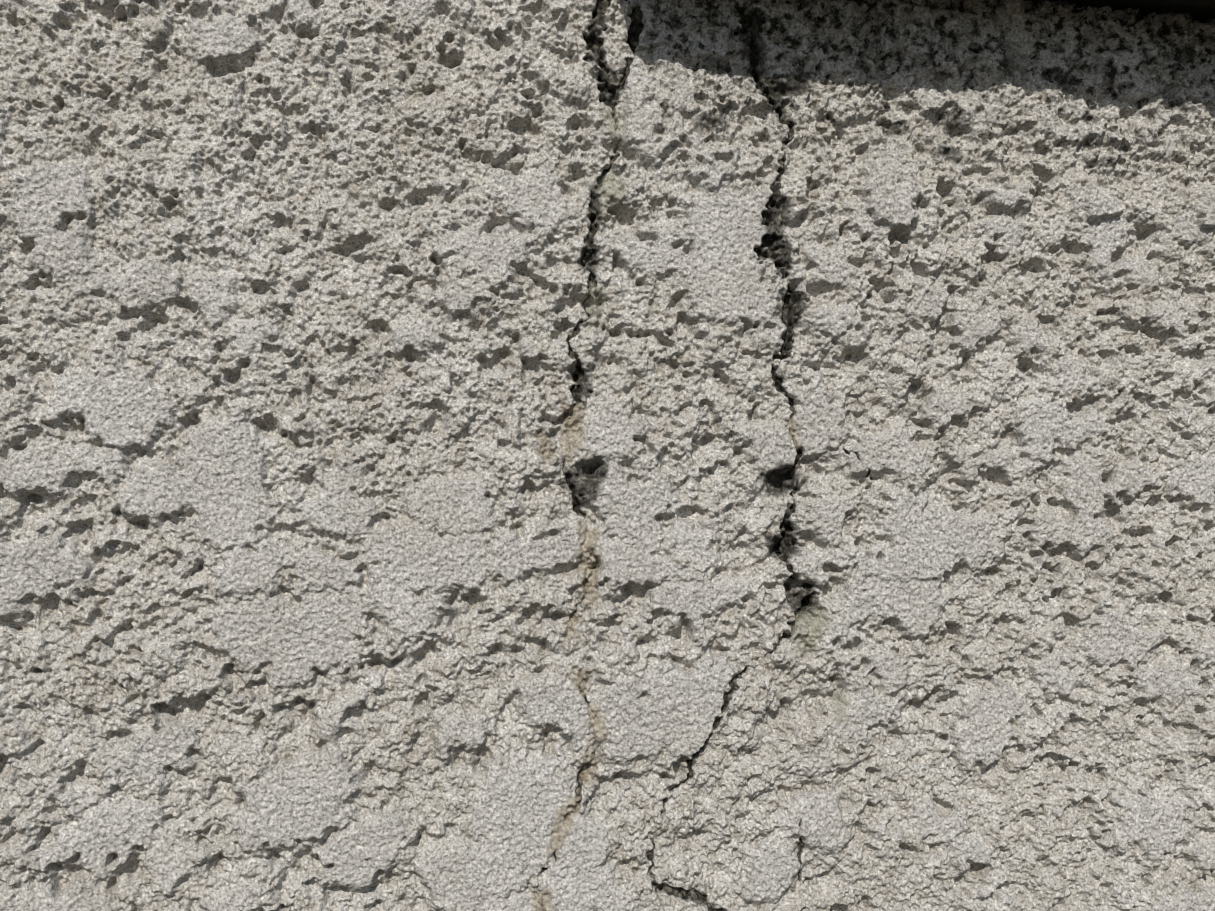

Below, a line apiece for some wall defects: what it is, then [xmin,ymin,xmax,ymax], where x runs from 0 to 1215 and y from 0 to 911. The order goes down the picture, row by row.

crack [566,0,644,416]
crack [561,460,586,518]
crack [646,6,808,911]
crack [570,555,600,624]
crack [565,763,589,820]